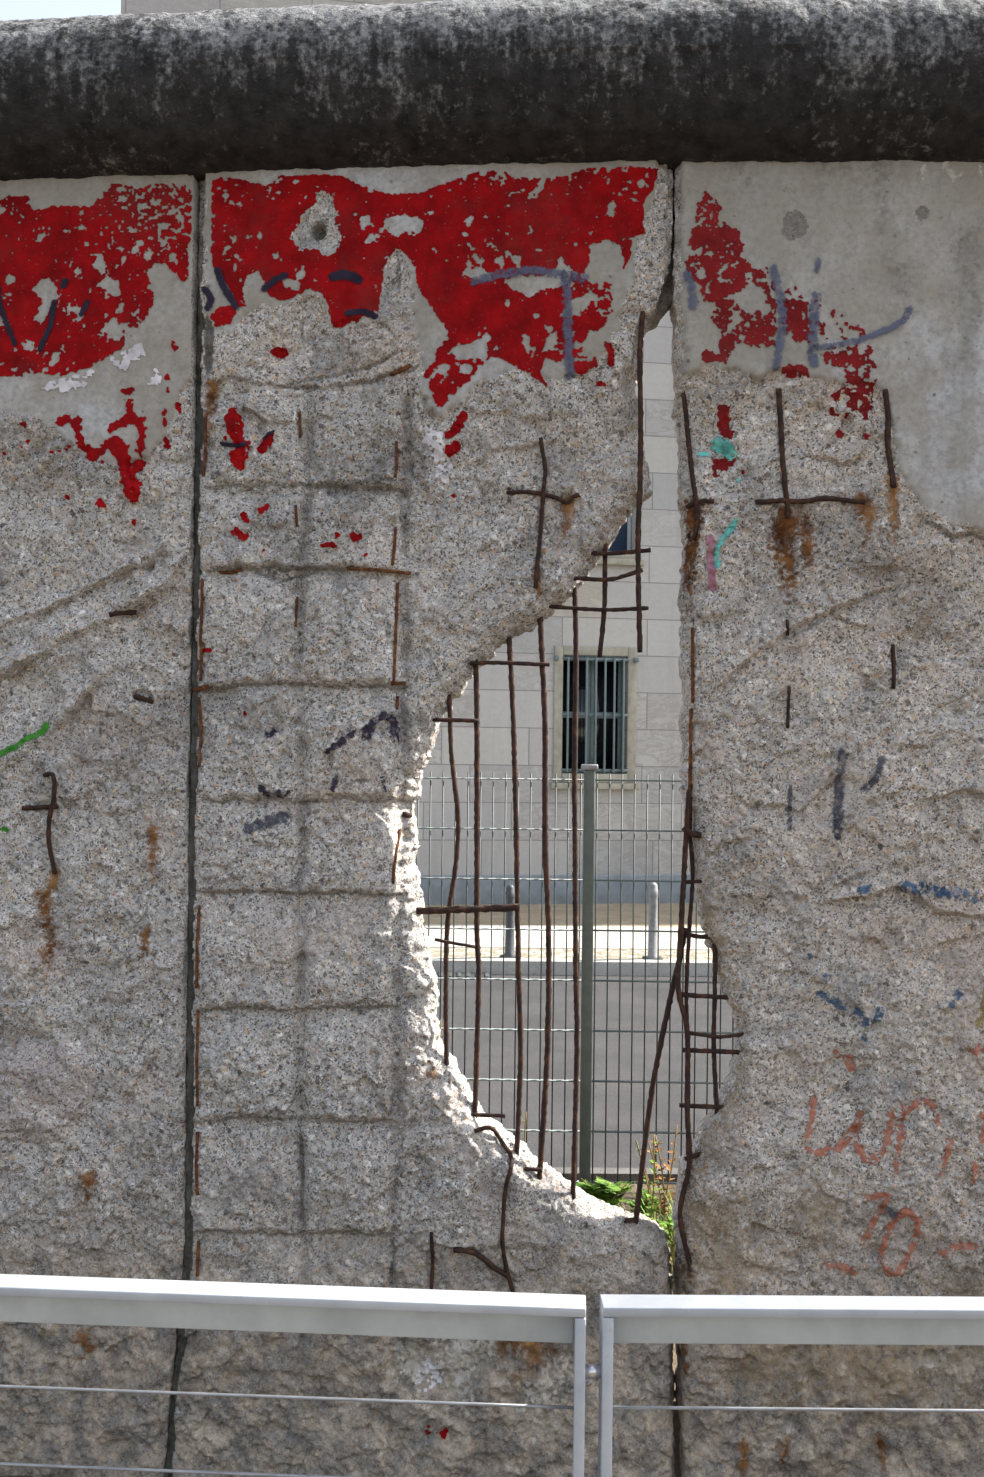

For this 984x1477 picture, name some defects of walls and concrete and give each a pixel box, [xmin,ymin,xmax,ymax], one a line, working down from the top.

peeling [0,183,198,393]
rust [683,499,703,612]
rust [767,506,816,605]
rust [855,475,899,542]
spalling [190,163,984,1364]
spalling [0,382,196,1280]
rust [35,868,60,965]
rust [78,1171,97,1201]
spalling [0,1317,599,1477]
spalling [612,1343,984,1477]